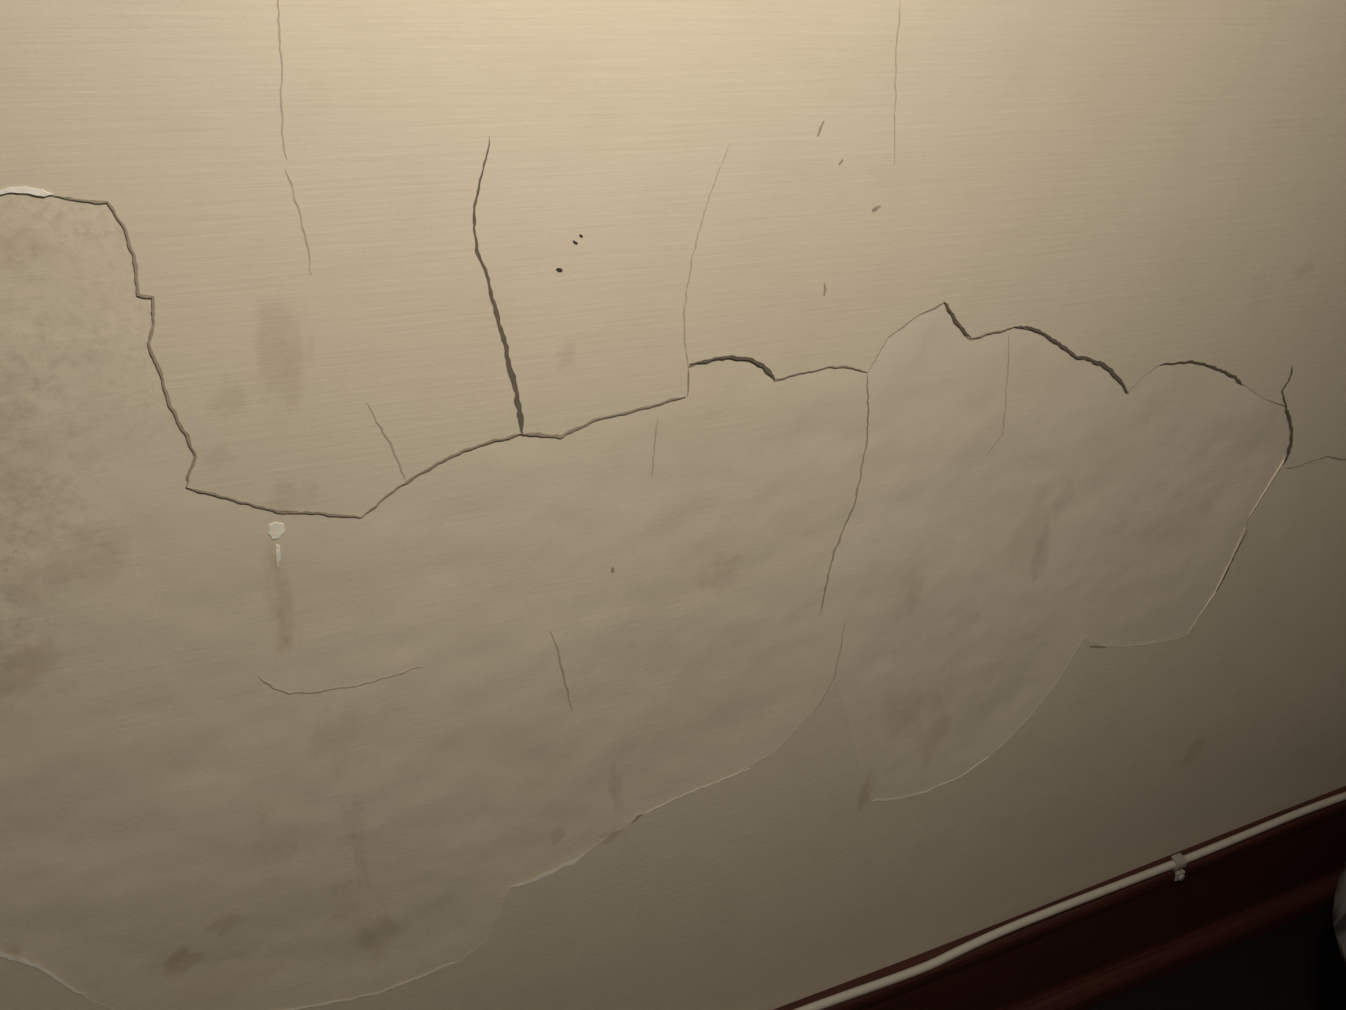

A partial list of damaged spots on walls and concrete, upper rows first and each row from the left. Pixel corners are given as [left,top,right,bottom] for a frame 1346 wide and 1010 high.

crack [277,0,311,272]
crack [893,2,901,161]
crack [54,136,1129,709]
crack [1161,360,1242,385]
crack [1188,368,1346,633]